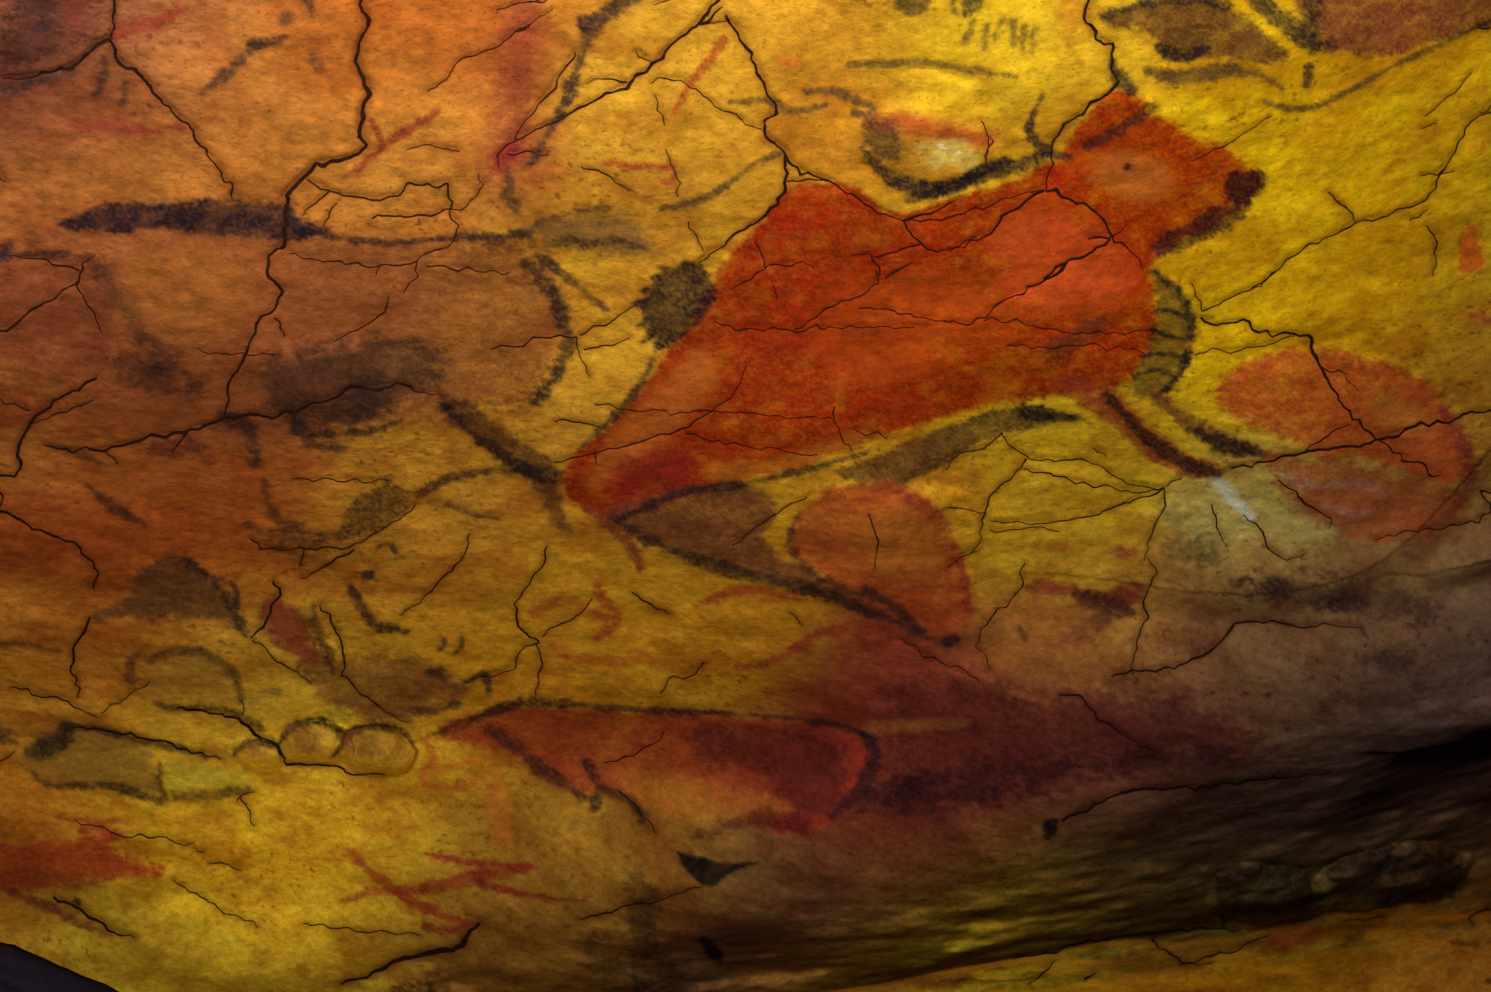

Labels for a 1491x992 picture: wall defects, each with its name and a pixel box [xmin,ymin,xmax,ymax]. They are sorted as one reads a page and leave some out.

crack [1191,72,1491,561]
crack [0,0,1152,776]
crack [900,432,1360,682]
crack [237,791,255,827]
crack [604,731,664,833]
crack [1059,694,1332,822]
crack [53,896,134,938]
crack [74,820,258,928]
crack [303,922,480,985]
crack [580,887,702,920]